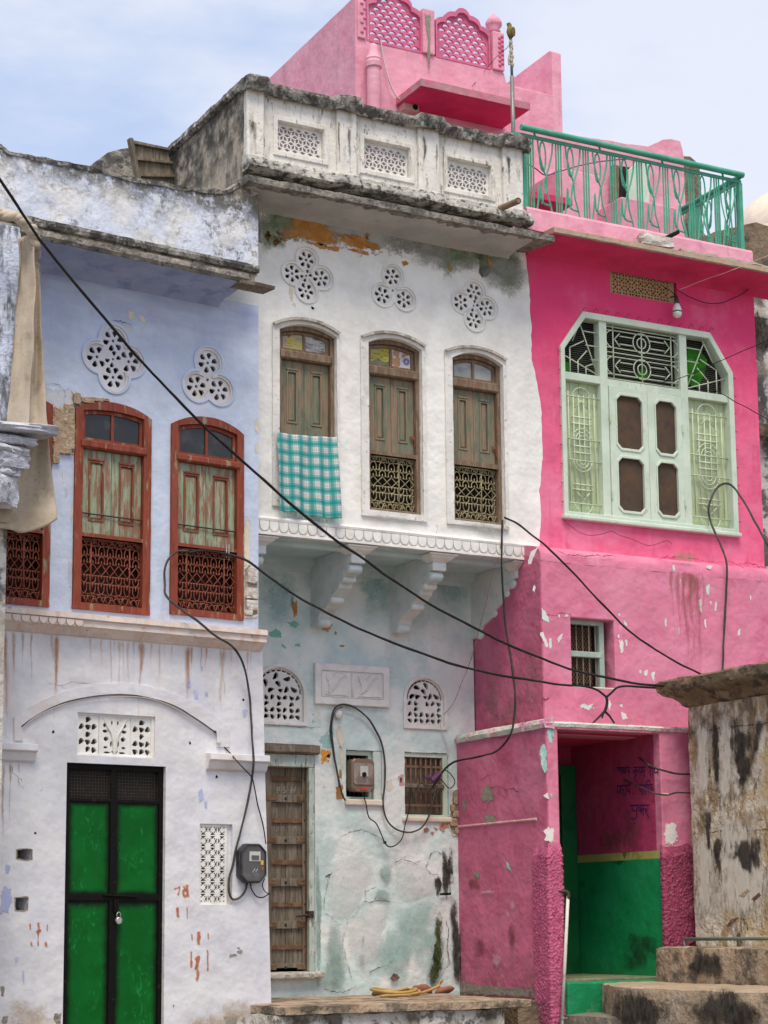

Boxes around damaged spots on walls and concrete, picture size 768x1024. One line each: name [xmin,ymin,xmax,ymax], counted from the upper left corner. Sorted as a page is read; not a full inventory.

peeling [260,213,433,266]
spalling [45,387,111,522]
peeling [540,608,569,649]
peeling [539,728,554,773]
flaking render [481,785,496,823]
peeling [543,827,554,844]
leakage [694,718,768,918]
crack [318,873,393,993]
leakage [380,853,461,984]